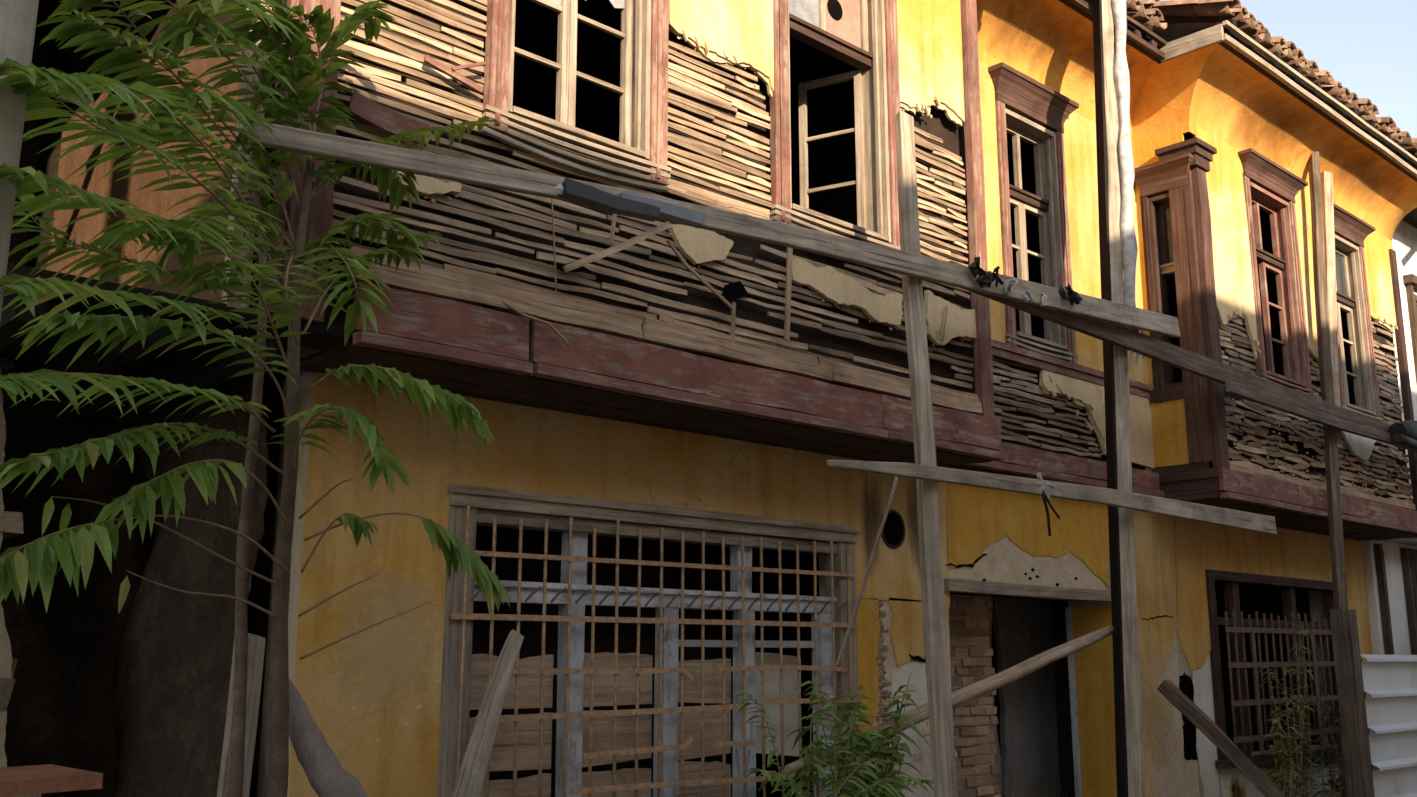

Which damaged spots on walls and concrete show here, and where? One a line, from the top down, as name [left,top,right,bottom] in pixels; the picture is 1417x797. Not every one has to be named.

flaking render [336,0,772,220]
flaking render [900,96,969,266]
flaking render [328,160,911,400]
flaking render [922,280,1106,458]
flaking render [1218,311,1265,376]
flaking render [1224,385,1416,510]
flaking render [1371,317,1403,425]
flaking render [949,538,1108,595]
flaking render [875,600,934,797]